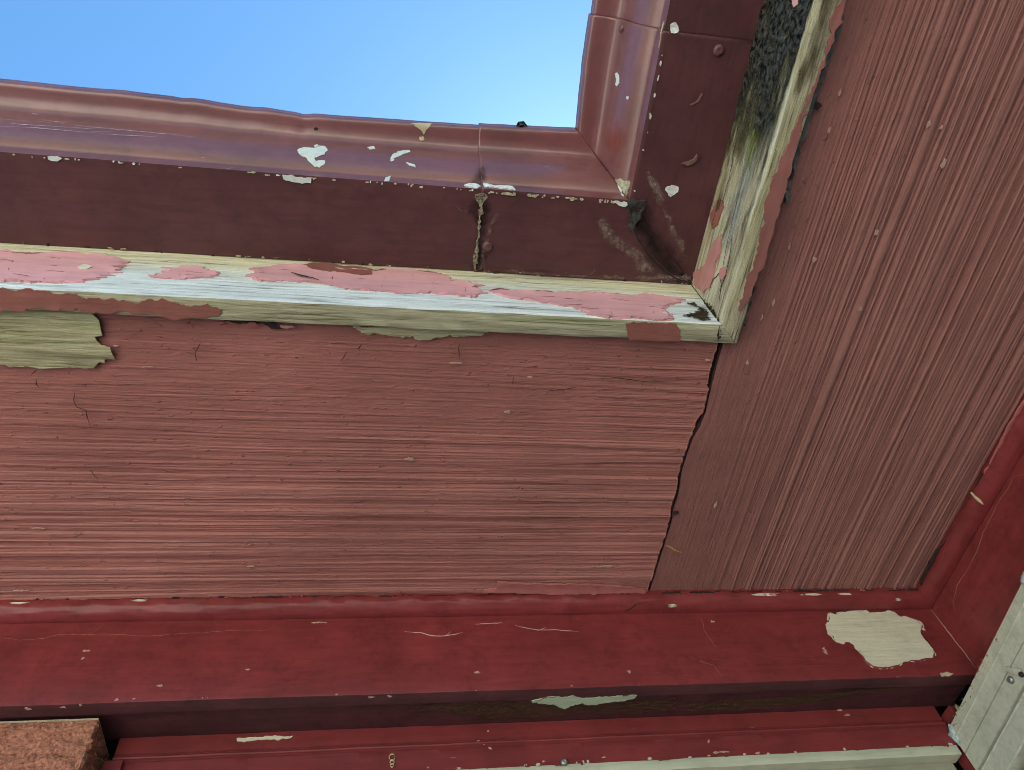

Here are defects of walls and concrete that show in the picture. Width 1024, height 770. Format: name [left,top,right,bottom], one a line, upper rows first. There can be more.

peeling [247,144,328,184]
damp [716,0,831,233]
peeling [738,0,846,311]
peeling [676,200,727,293]
peeling [0,242,221,369]
peeling [236,255,686,342]
peeling [822,589,936,678]
peeling [532,684,640,710]